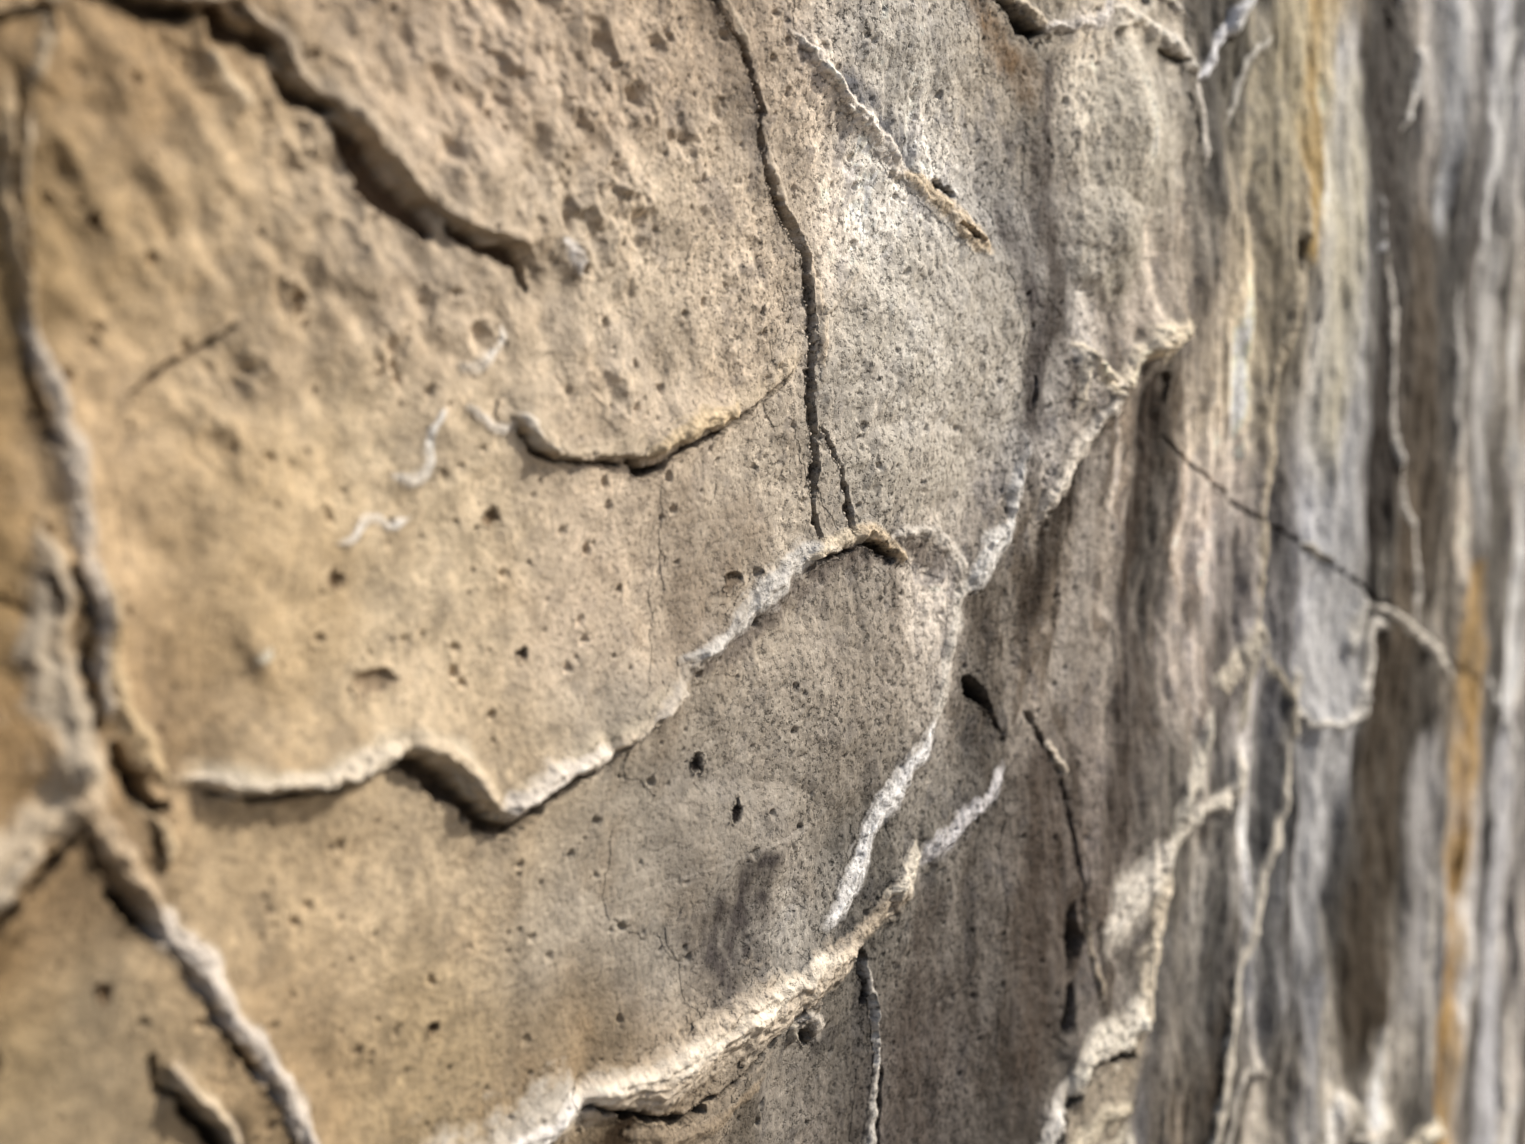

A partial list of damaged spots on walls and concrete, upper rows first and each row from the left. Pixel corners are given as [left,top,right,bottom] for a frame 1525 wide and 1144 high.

crack [710,0,898,565]
crack [932,178,988,242]
crack [993,0,1274,167]
crack [1384,0,1427,135]
crack [1448,106,1497,469]
crack [1161,161,1525,759]
crack [0,562,173,819]
crack [0,827,84,938]
crack [580,946,884,1144]
crack [962,694,1107,1042]
crack [1205,739,1294,1144]
crack [1315,841,1444,1144]